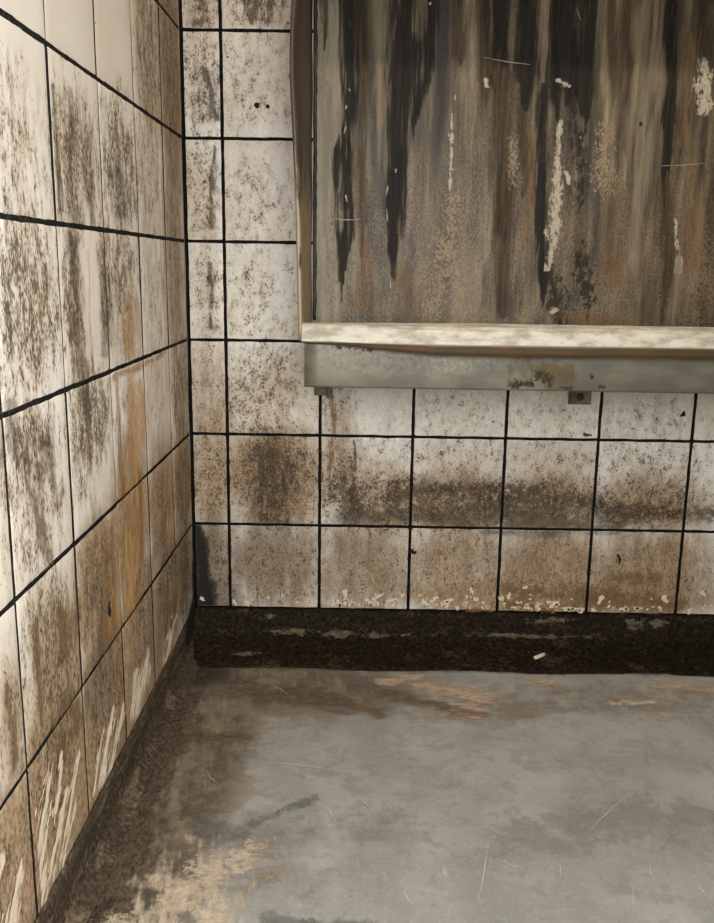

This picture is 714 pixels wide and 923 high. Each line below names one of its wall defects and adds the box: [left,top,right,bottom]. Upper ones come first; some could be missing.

water stain [691,0,714,117]
water stain [332,0,439,294]
water stain [422,0,617,325]
water stain [625,0,681,326]
water stain [18,424,53,577]
rust [105,383,145,636]
water stain [332,477,714,537]
spalling [331,589,405,607]
spalling [418,587,488,611]
peeling [463,585,670,639]
water stain [5,685,19,771]
water stain [32,617,83,780]